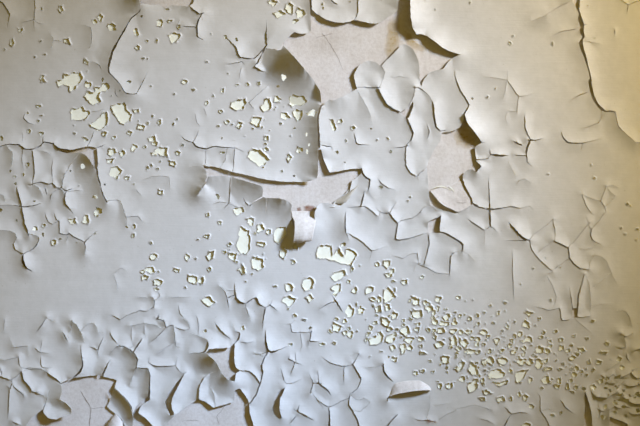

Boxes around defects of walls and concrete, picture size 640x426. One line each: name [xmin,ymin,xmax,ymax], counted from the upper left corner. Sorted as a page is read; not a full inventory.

crack [0,0,155,143]
crack [498,0,640,158]
peeling [126,114,163,137]
peeling [143,134,178,168]
crack [172,102,249,168]
crack [294,98,342,156]
peeling [178,0,625,305]
peeling [0,222,558,426]
crack [528,271,640,338]
crack [156,362,199,423]
peeling [556,336,589,394]
peeling [586,323,640,426]